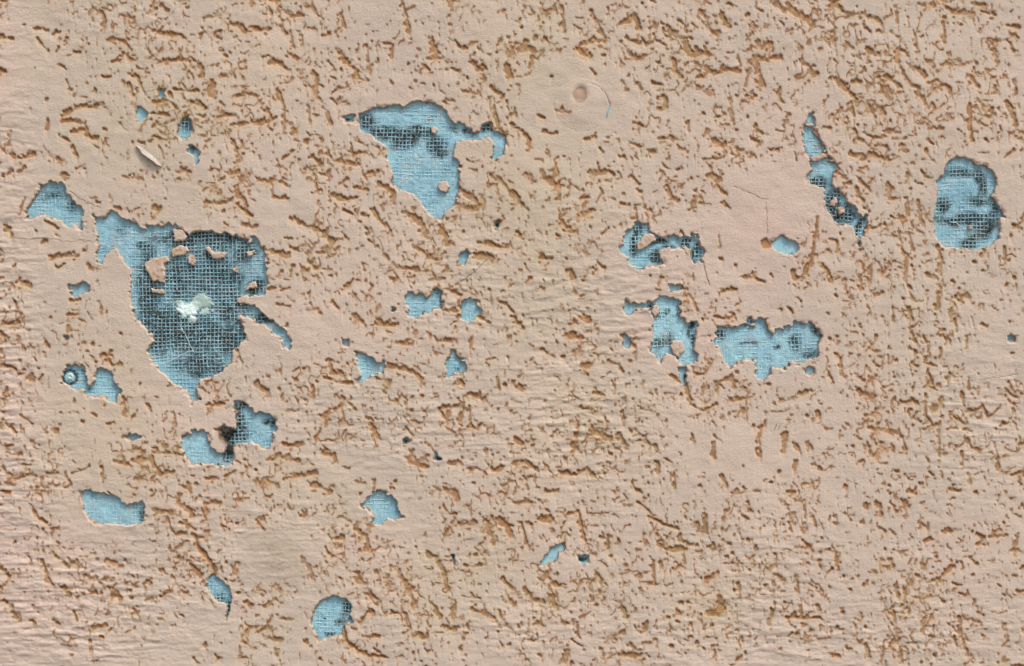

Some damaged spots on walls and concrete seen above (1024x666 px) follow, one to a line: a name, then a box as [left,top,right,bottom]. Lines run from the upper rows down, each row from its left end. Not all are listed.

peeling [344,101,506,220]
peeling [802,112,867,247]
peeling [933,157,1003,250]
peeling [618,222,705,271]
peeling [27,181,292,403]
peeling [391,288,444,319]
peeling [623,284,698,386]
peeling [713,317,821,381]
peeling [181,401,278,467]
peeling [82,490,145,525]
peeling [361,490,404,525]
peeling [312,595,353,640]